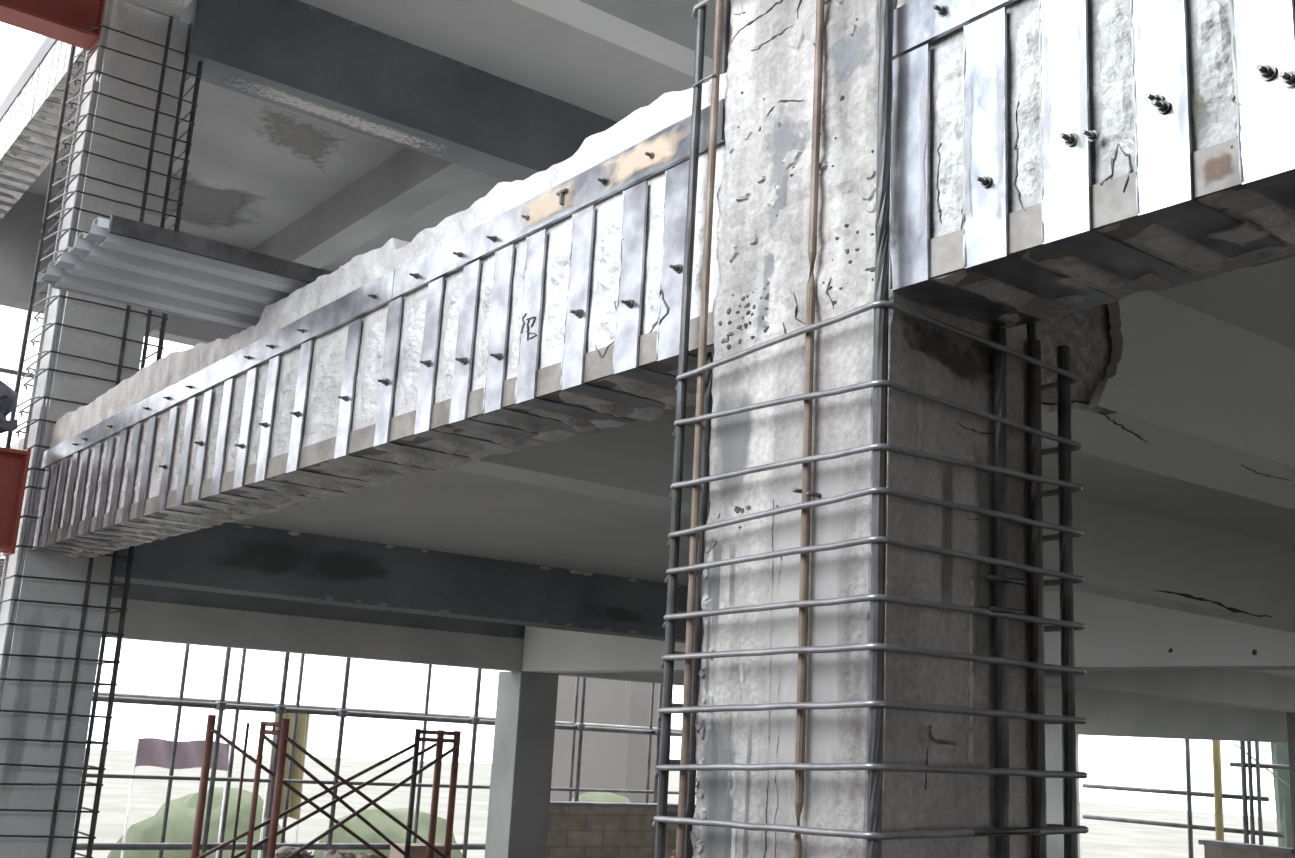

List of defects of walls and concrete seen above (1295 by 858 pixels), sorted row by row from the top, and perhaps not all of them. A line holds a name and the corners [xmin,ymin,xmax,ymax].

water stain [234,85,443,148]
crack [1099,412,1148,443]
crack [1242,465,1290,481]
spalling [993,327,1010,858]
spalling [1027,322,1078,858]
crack [1154,590,1272,617]